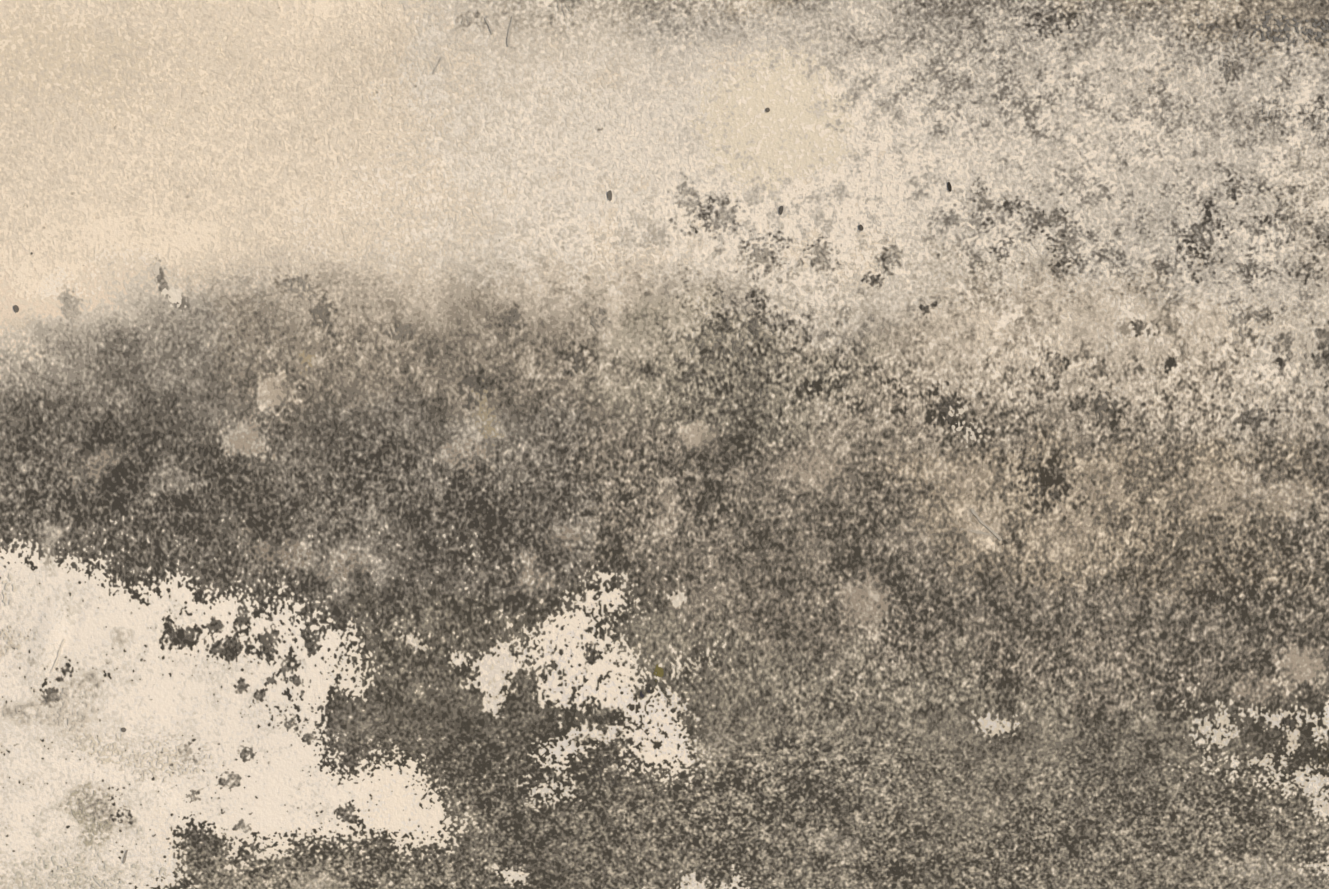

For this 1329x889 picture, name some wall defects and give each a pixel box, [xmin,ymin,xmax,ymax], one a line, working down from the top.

damp [0,0,284,169]
damp [3,670,225,789]
damp [0,783,166,889]